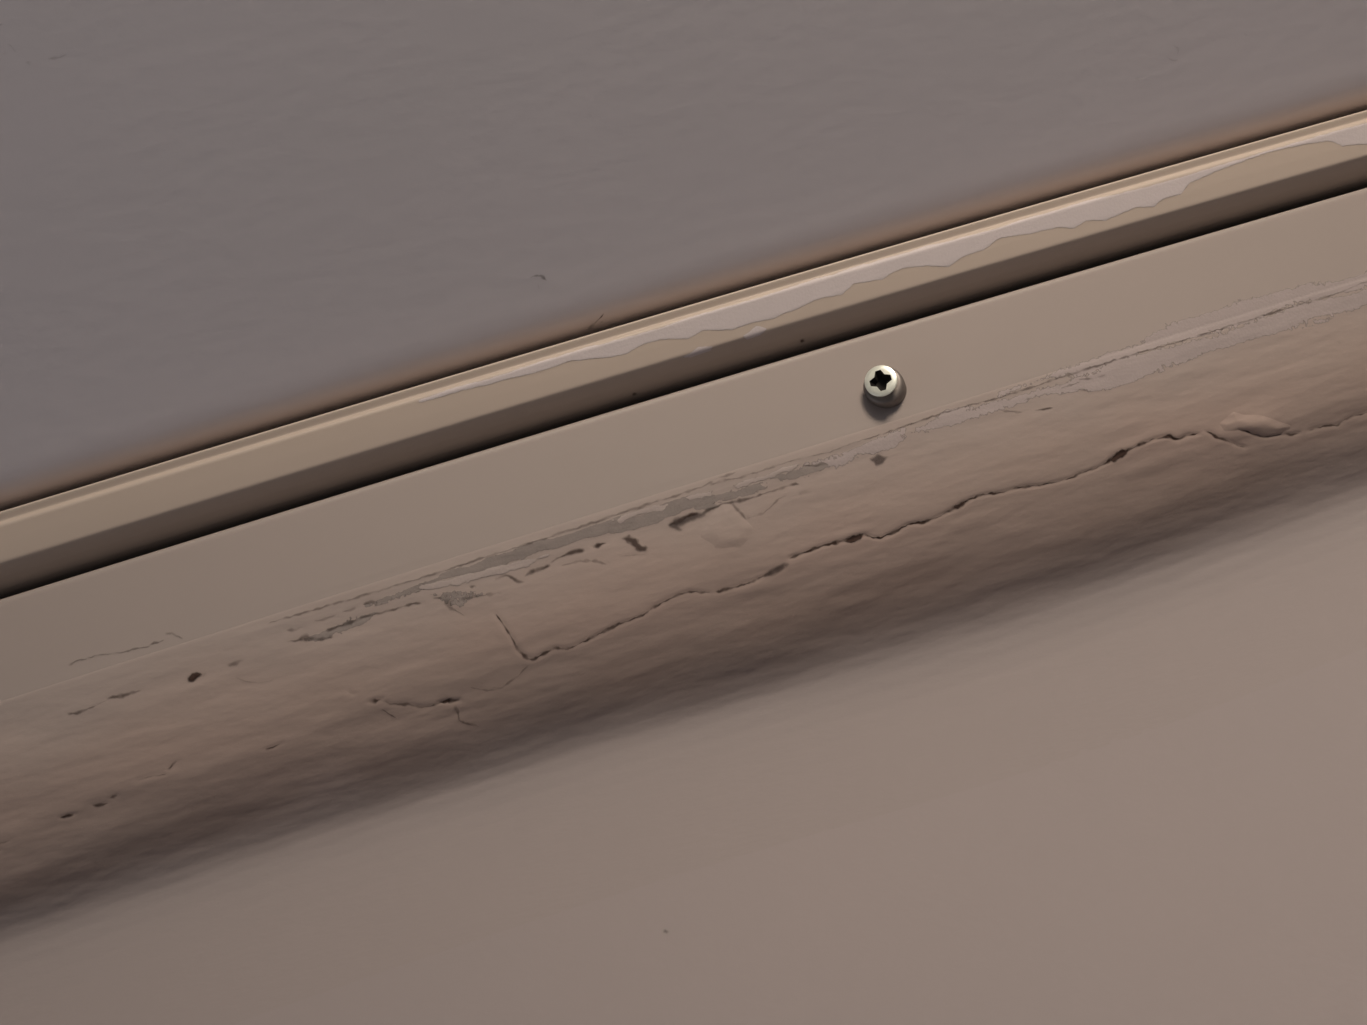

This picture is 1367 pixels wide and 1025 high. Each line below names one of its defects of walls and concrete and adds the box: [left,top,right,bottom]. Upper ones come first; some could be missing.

peeling [304,462,828,641]
crack [497,583,748,660]
crack [792,414,1363,558]